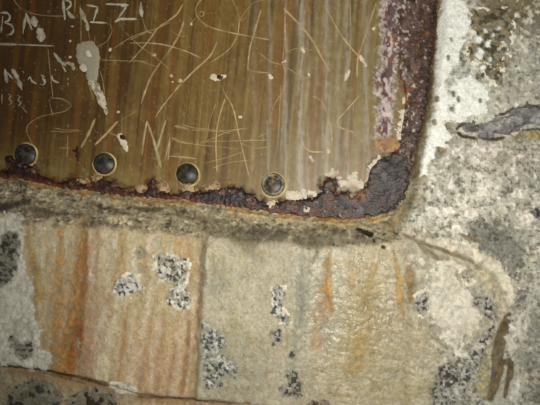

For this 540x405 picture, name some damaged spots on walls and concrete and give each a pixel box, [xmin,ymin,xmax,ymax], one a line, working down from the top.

corrosion [0,0,439,220]
damp [420,71,435,140]
flaking render [419,0,519,177]
damp [0,200,28,211]
flaking render [0,210,53,372]
corrosion [52,232,97,384]
spalling [152,251,192,311]
spalling [200,321,237,389]
spalling [270,285,293,345]
spalling [279,370,301,399]
flaking render [409,254,499,405]
damp [482,313,514,401]